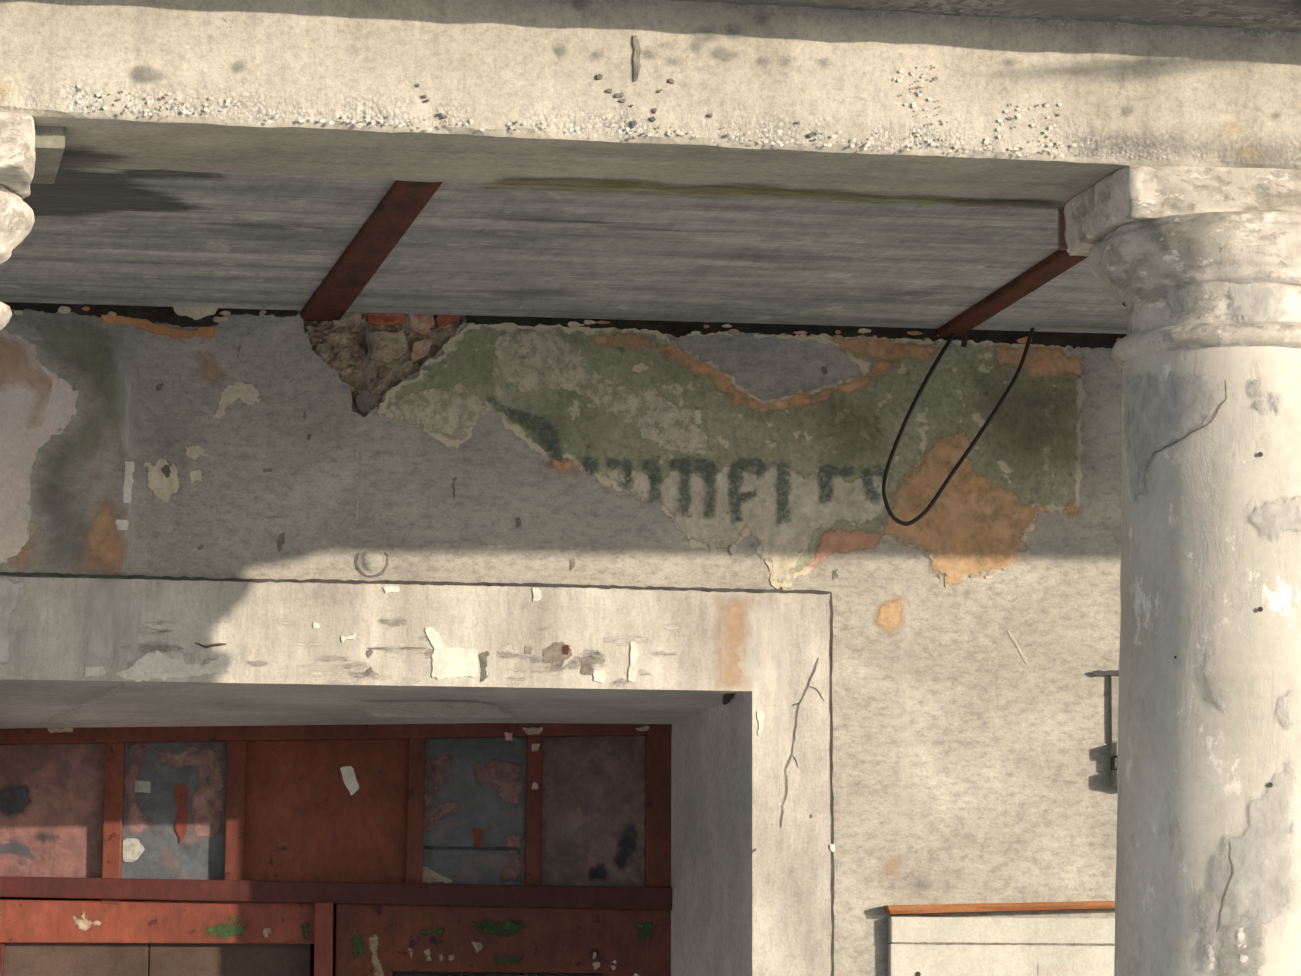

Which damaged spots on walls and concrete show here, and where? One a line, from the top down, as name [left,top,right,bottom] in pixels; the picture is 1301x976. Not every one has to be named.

water stain [22,151,215,217]
peeling [1229,284,1288,322]
peeling [0,302,1127,590]
peeling [1122,372,1227,501]
spalling [532,587,542,602]
spalling [84,627,250,682]
spalling [306,627,658,686]
spalling [722,693,737,705]
crack [0,572,835,976]
peeling [1196,763,1296,976]